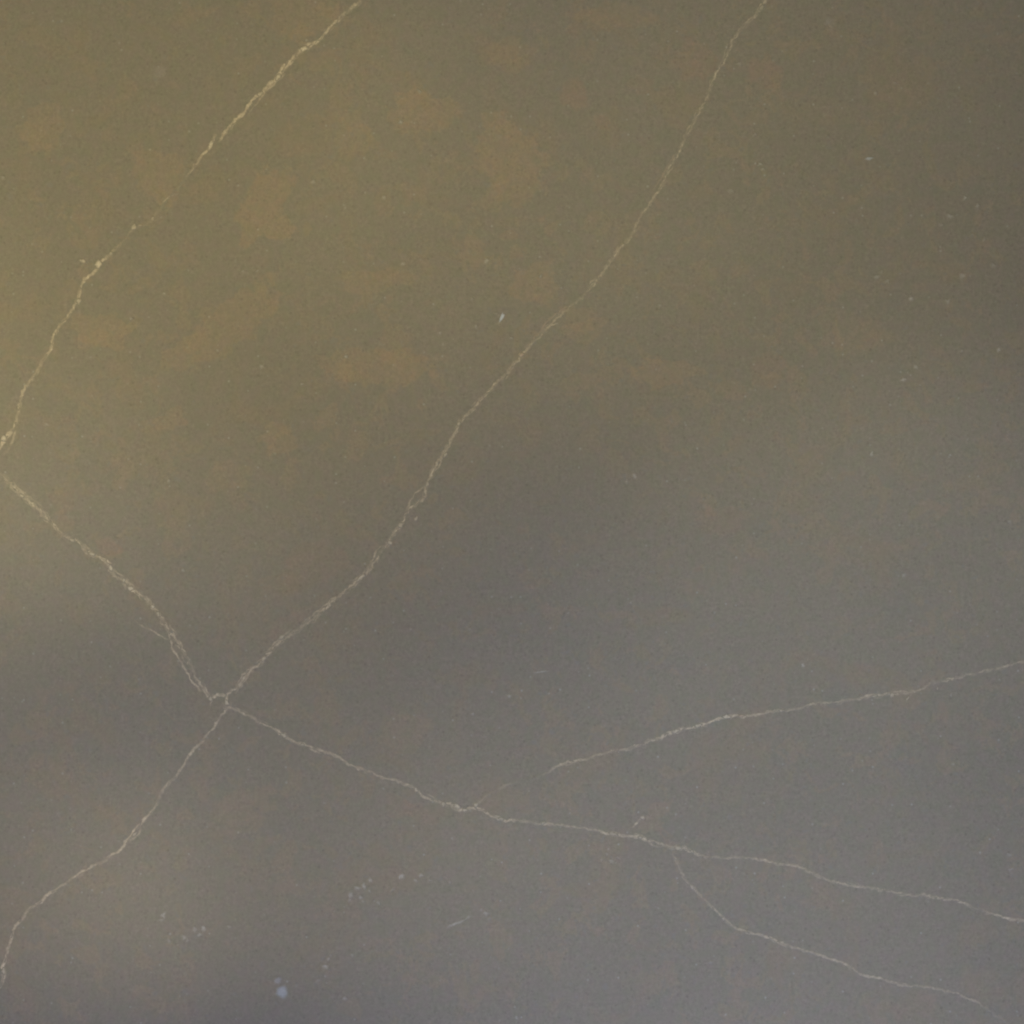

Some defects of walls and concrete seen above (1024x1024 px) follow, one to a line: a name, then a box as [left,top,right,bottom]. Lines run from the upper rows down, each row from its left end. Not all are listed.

crack [0,0,767,708]
crack [0,660,1024,989]
crack [670,853,1009,1024]